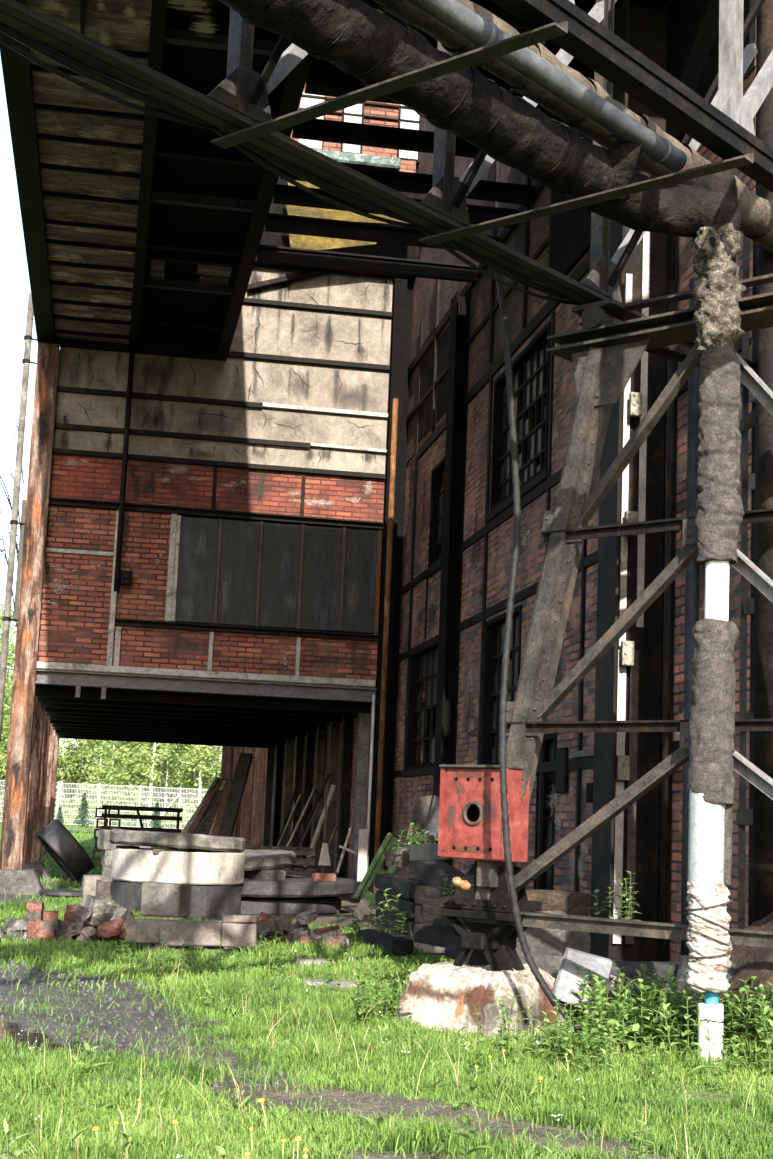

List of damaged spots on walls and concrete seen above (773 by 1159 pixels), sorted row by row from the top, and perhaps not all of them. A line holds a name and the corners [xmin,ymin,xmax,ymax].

crack [190,311,303,454]
leakage [251,273,260,327]
crack [288,281,375,428]
leakage [335,371,365,402]